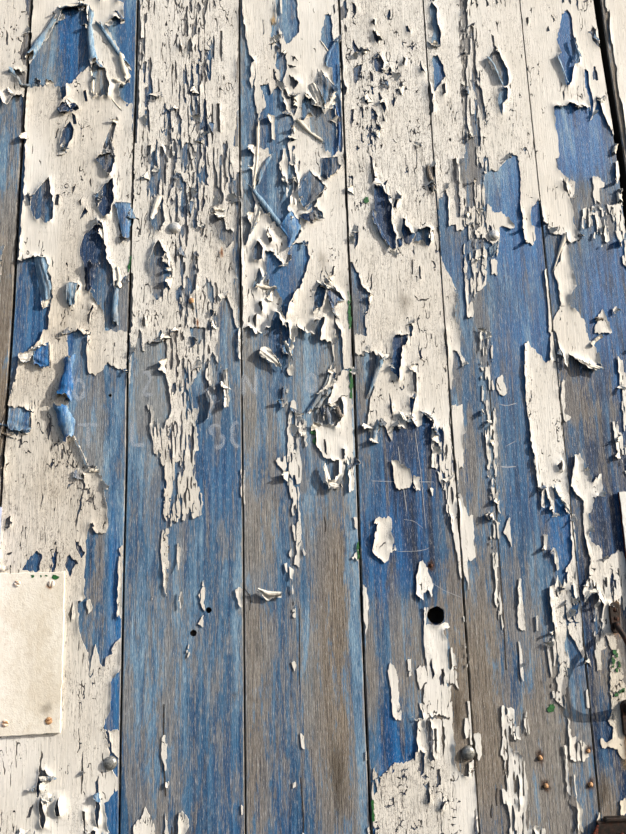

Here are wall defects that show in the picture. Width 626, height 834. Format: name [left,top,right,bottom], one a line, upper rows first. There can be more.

peeling [8,0,153,156]
peeling [0,87,59,474]
peeling [53,0,343,834]
peeling [242,0,626,834]
peeling [19,751,59,834]